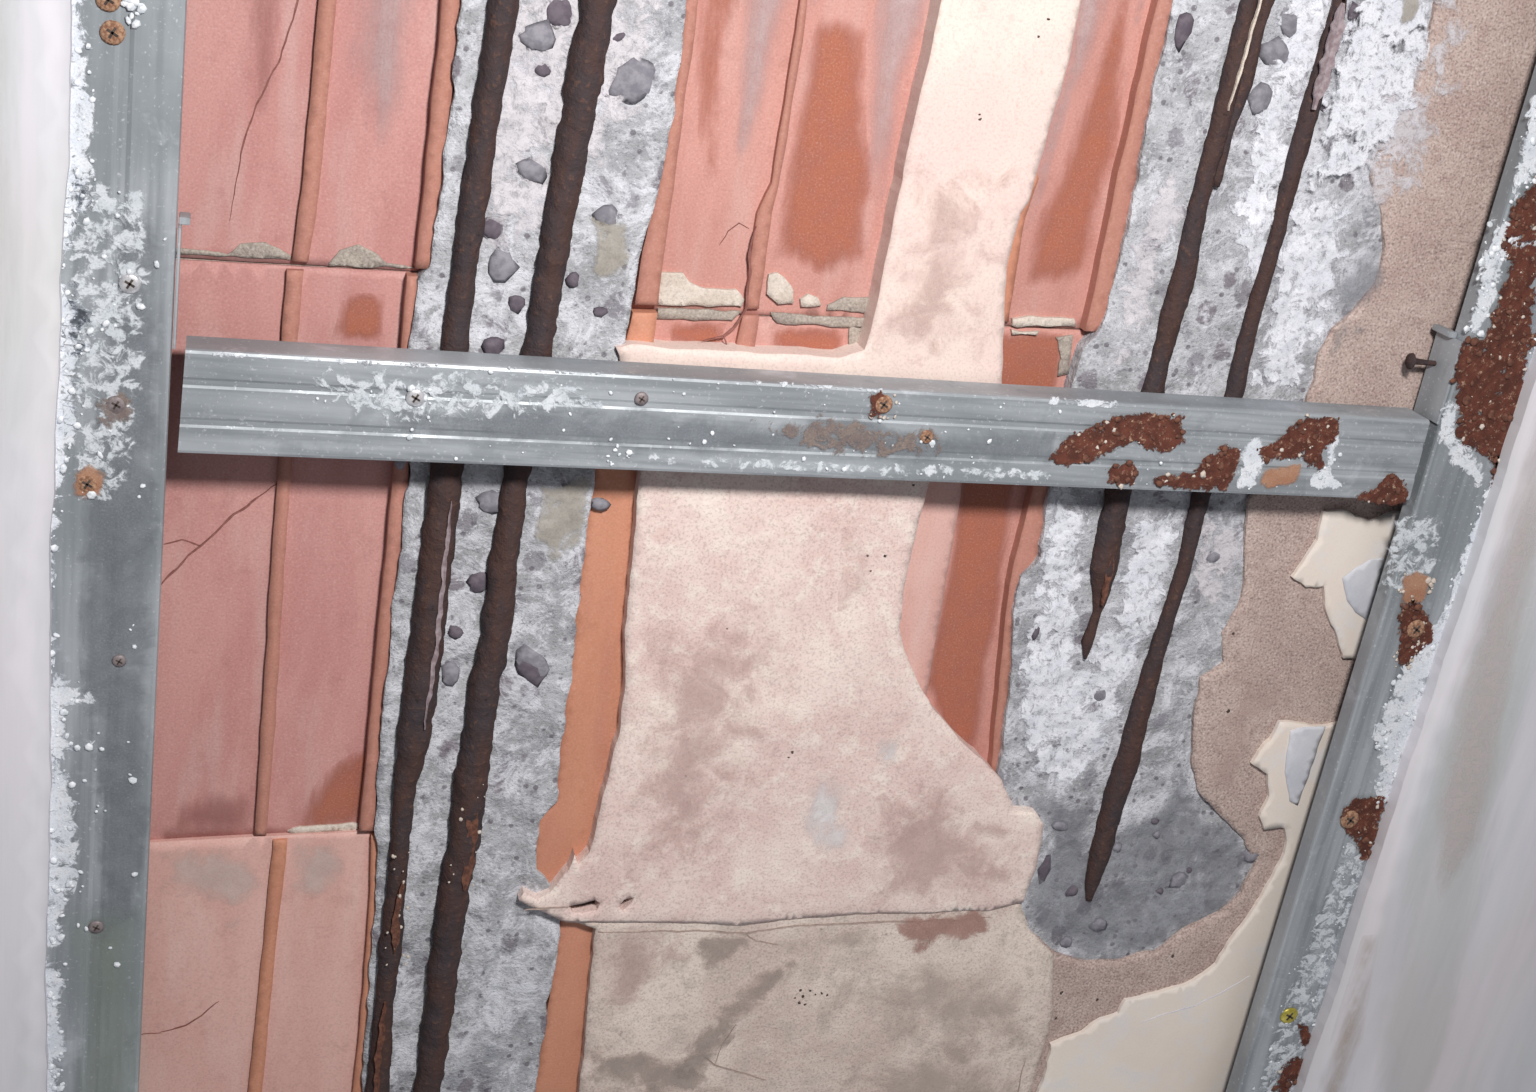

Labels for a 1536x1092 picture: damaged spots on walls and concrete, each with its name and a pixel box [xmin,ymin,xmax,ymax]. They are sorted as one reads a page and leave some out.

crack [230,0,299,218]
corrosion [441,0,519,352]
corrosion [520,0,617,357]
damp [786,27,865,267]
damp [879,0,921,129]
peeling [552,0,1536,411]
damp [1230,0,1467,387]
crack [161,483,277,585]
spalling [361,461,504,1092]
corrosion [413,465,532,1092]
peeling [440,466,1403,1092]
crack [141,1001,219,1035]